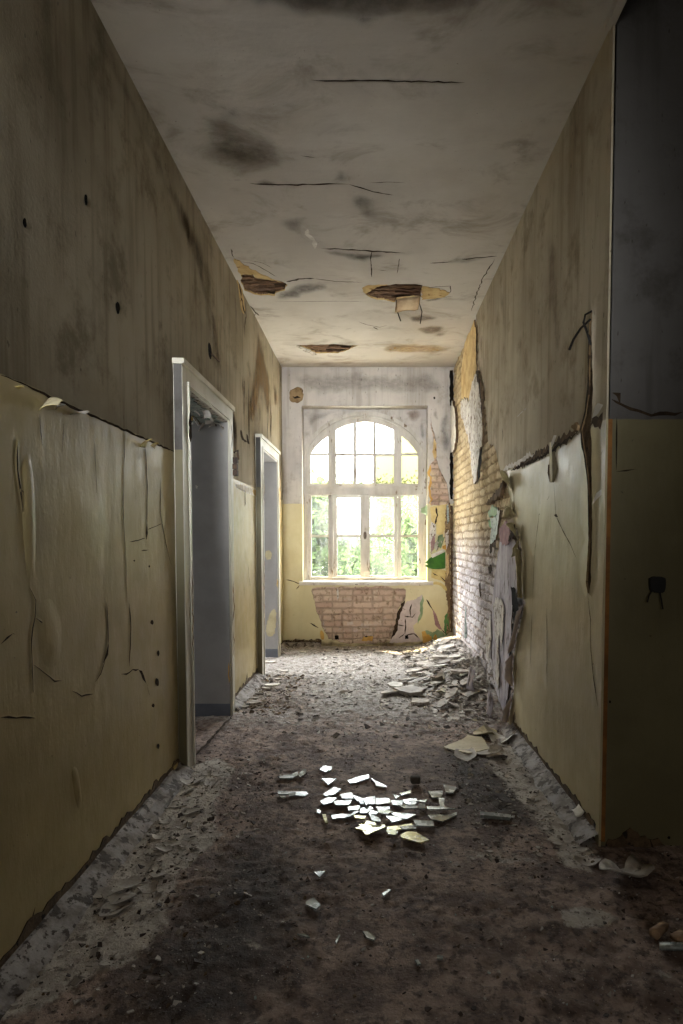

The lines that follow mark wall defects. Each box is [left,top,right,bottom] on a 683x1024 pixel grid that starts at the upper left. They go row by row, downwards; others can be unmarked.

crack [251,182,405,195]
crack [314,77,465,85]
crack [0,375,174,720]
flaking render [264,310,603,841]